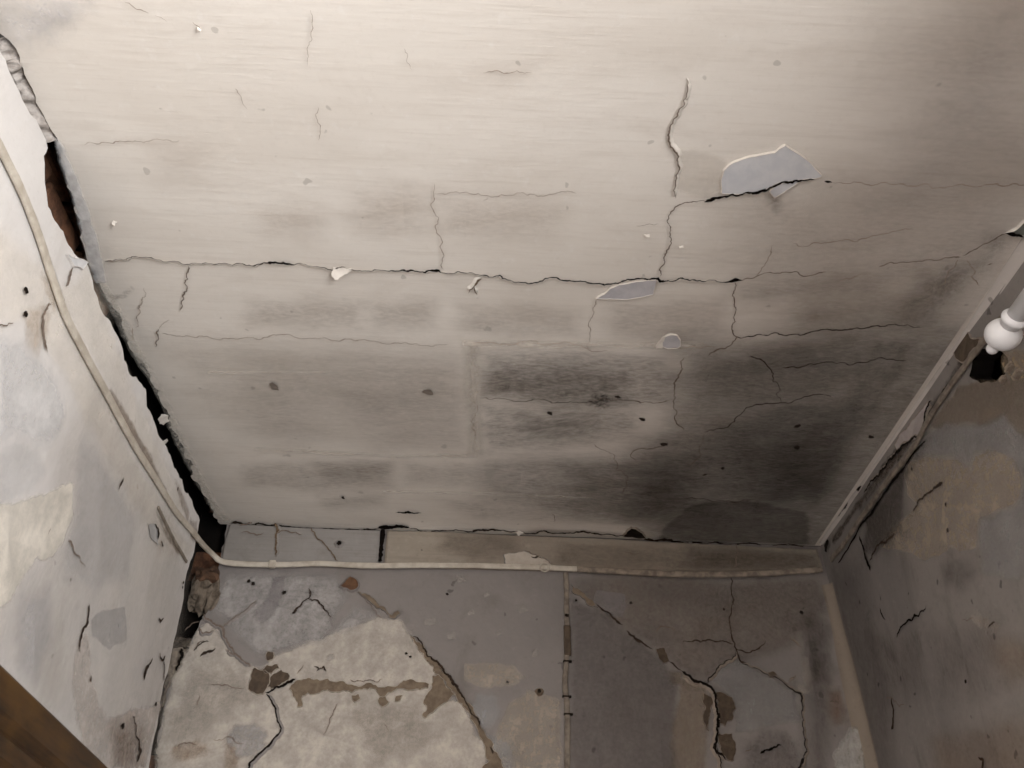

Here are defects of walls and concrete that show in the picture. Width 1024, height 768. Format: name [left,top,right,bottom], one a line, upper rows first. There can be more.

crack [85,138,179,146]
peeling [720,144,822,198]
crack [105,78,1024,465]
crack [232,385,947,570]
peeling [218,576,504,768]
crack [597,578,809,768]